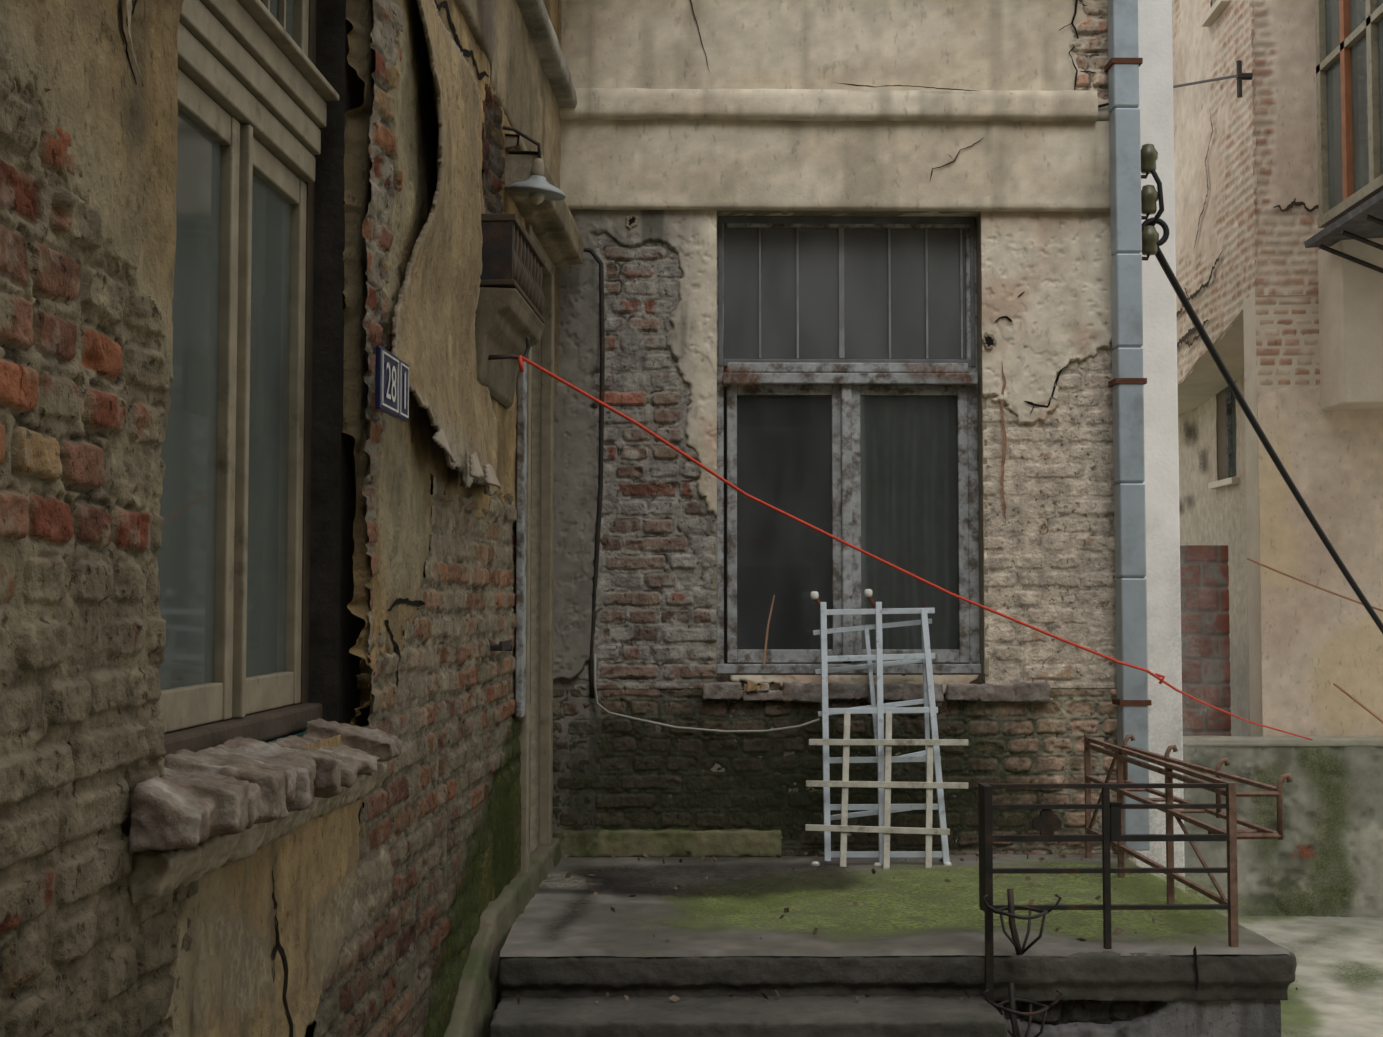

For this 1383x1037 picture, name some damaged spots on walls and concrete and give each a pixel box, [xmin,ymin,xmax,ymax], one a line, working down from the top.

crack [119,0,144,87]
crack [435,0,489,80]
flaking render [1069,0,1109,108]
crack [1177,114,1223,348]
flaking render [0,24,199,1037]
flaking render [552,232,1127,856]
crack [271,871,293,1037]